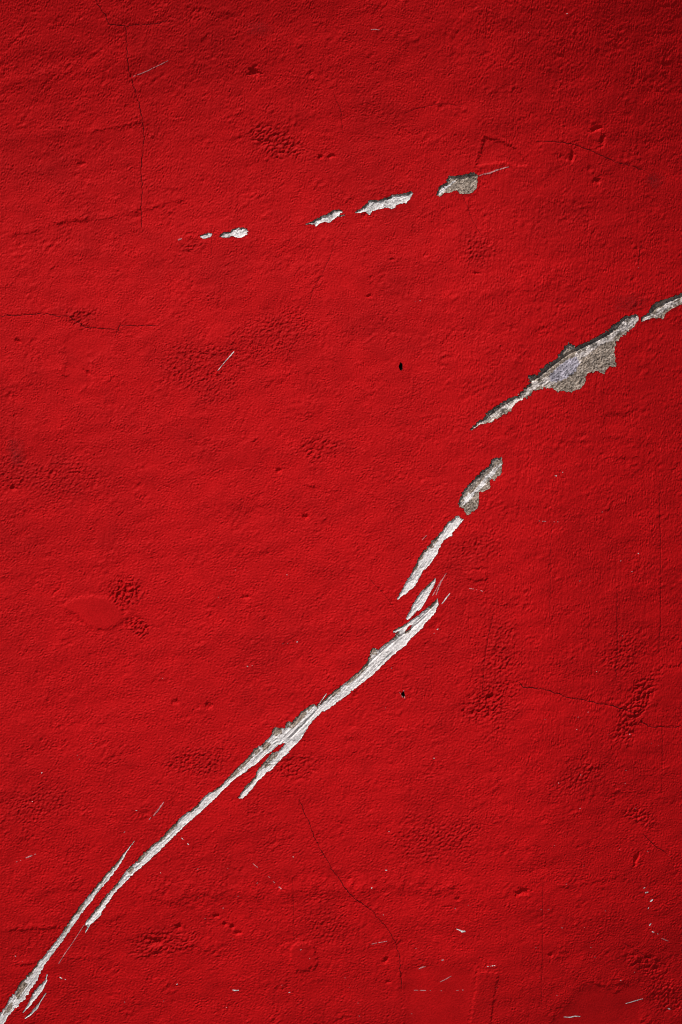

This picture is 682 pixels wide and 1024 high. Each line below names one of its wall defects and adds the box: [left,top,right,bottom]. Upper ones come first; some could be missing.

peeling [200,227,248,238]
peeling [306,192,413,226]
peeling [437,172,478,197]
spalling [470,293,682,430]
peeling [212,457,503,798]
spalling [62,821,178,933]
spalling [3,961,43,1015]